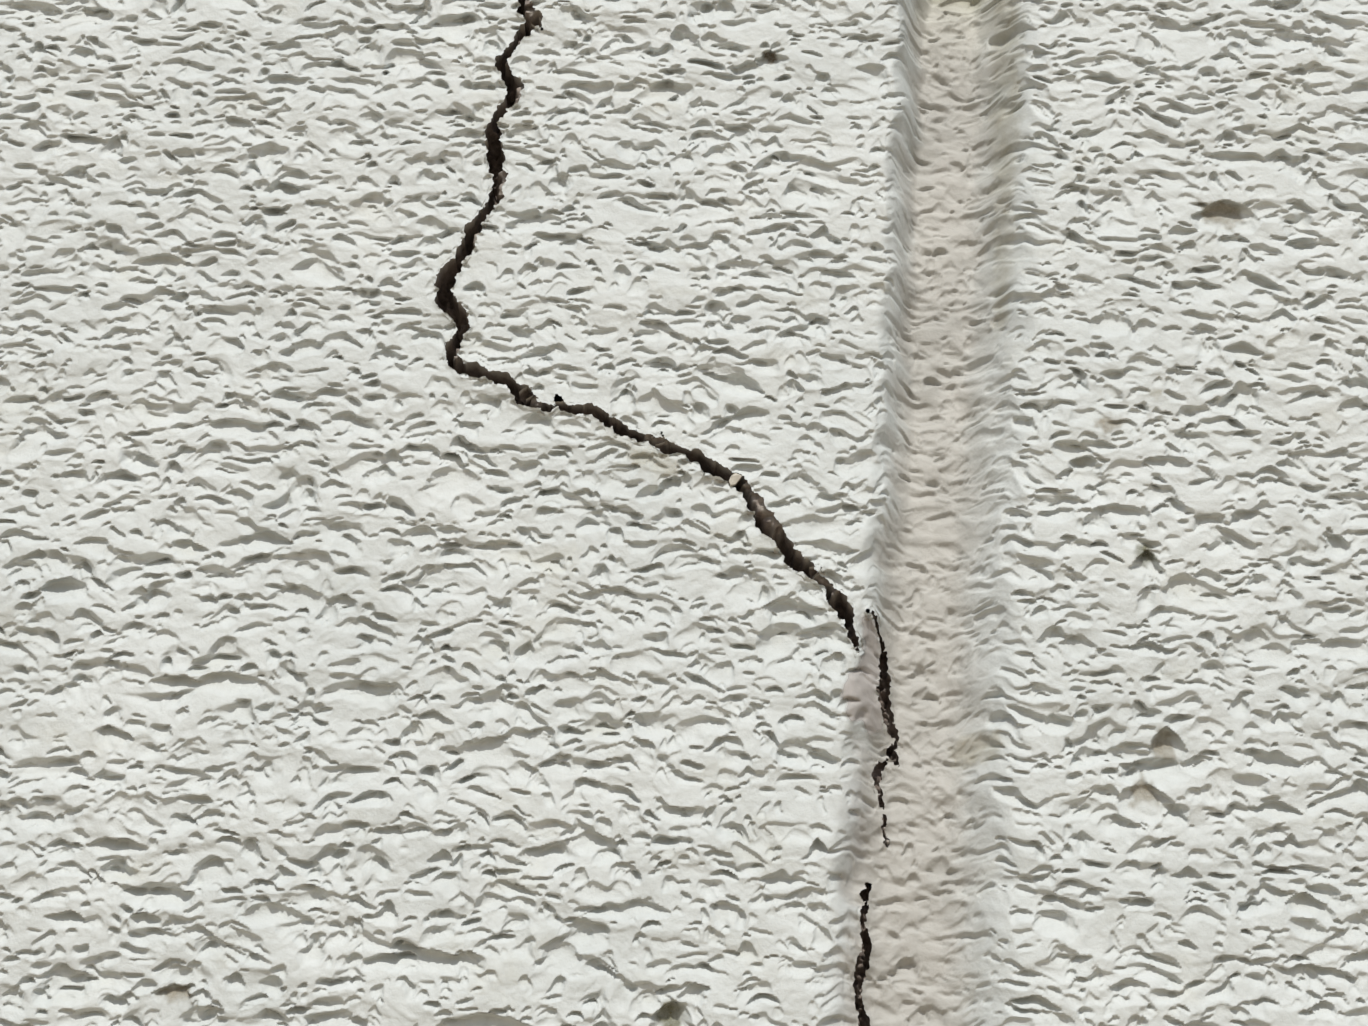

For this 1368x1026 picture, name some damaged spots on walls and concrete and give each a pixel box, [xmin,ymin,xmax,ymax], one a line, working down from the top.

crack [434,0,899,847]
crack [851,882,875,1026]